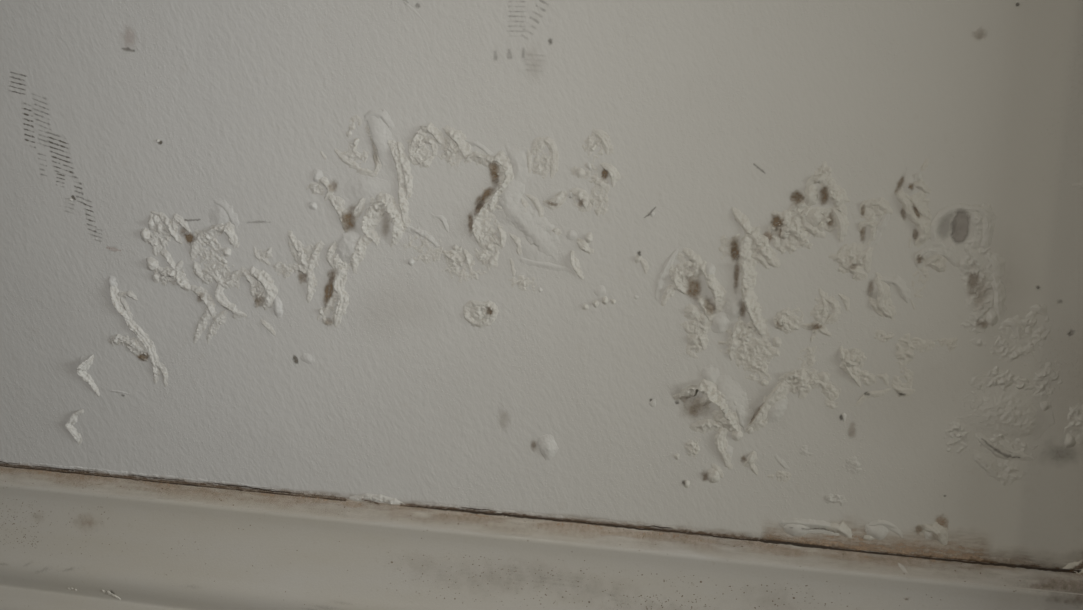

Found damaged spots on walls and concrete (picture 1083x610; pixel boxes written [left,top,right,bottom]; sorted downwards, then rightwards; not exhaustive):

crack [0,461,346,501]
crack [401,503,1081,573]